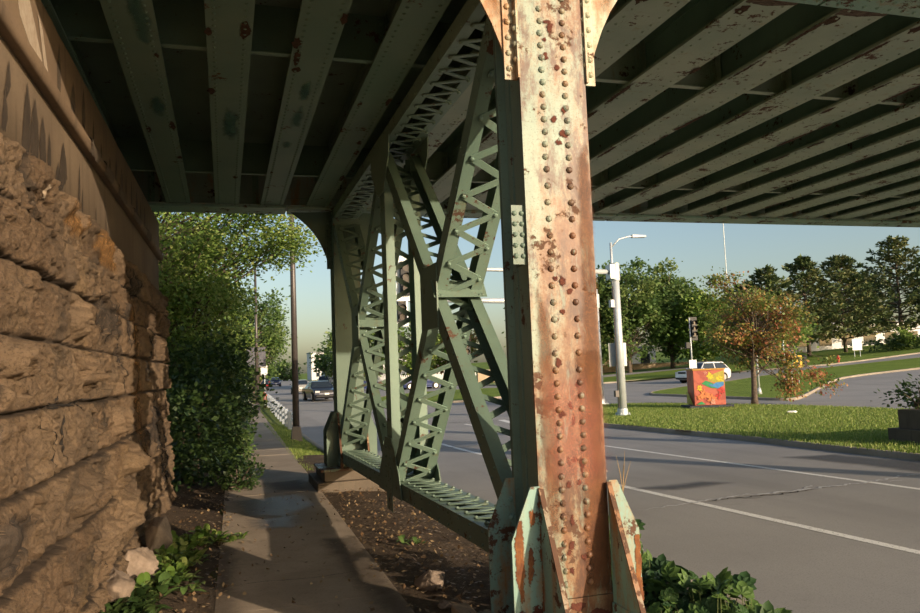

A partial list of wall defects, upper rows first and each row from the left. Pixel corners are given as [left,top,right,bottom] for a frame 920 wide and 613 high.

rust [542,19,560,71]
rust [551,107,568,145]
rust [567,456,585,488]